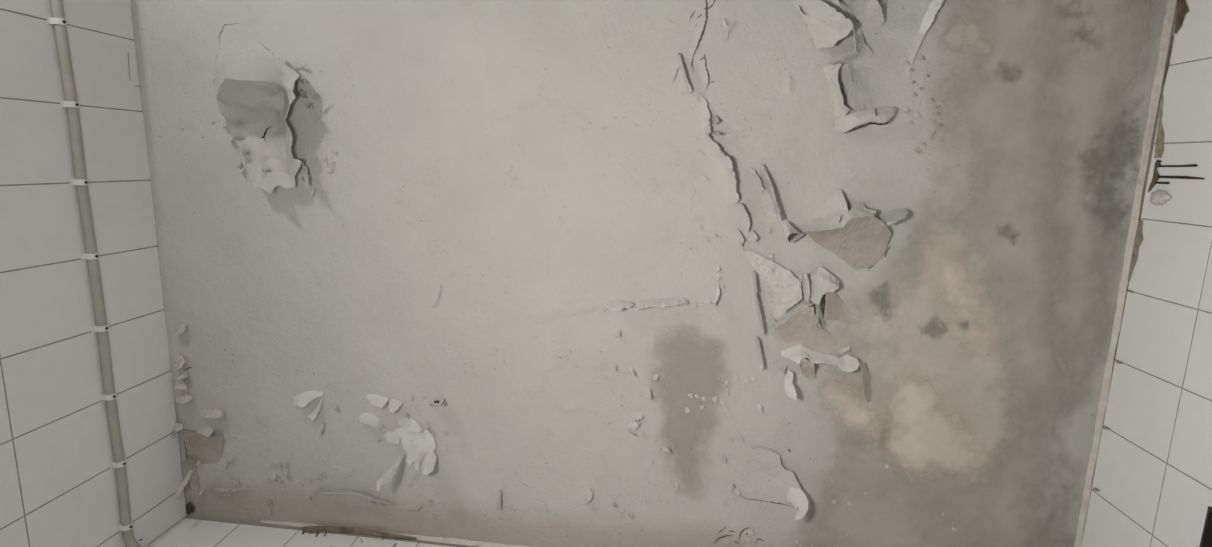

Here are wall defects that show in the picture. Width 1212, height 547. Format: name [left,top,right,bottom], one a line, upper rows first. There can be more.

peeling [208,23,316,196]
crack [673,0,716,91]
peeling [792,0,945,153]
water stain [1154,95,1164,158]
corrosion [1148,160,1205,192]
peeling [676,93,909,413]
water stain [809,0,1147,547]
spalling [171,354,245,515]
peeling [293,384,449,491]
water stain [667,339,715,478]
peeling [721,433,808,520]